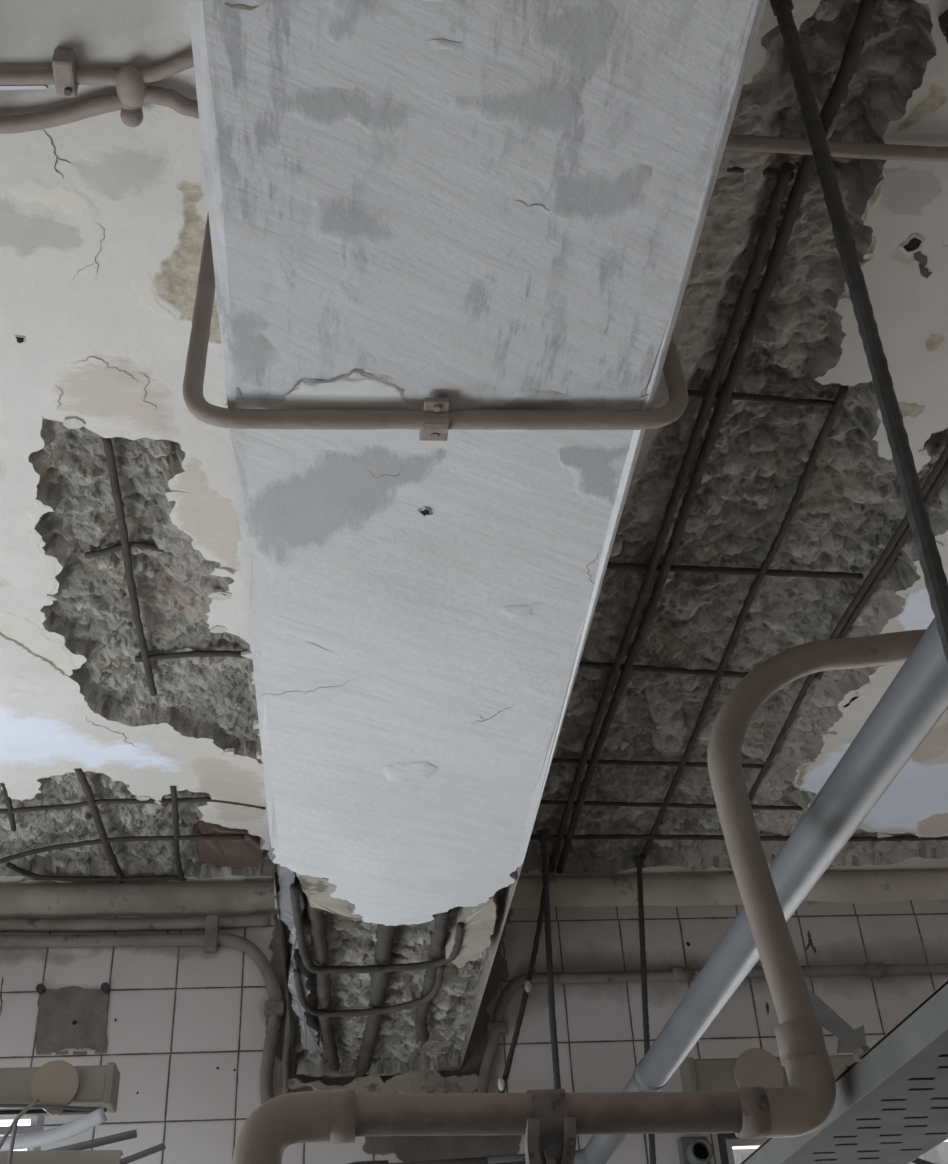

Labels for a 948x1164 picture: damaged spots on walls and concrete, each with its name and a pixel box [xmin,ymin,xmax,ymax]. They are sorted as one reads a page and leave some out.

flaking render [0,0,192,70]
spalling [729,25,808,139]
spalling [796,0,948,144]
crack [42,130,70,179]
spalling [831,157,943,268]
crack [71,223,105,281]
flaking render [898,401,927,419]
spalling [917,428,948,549]
spalling [0,144,921,1079]
flaking render [911,721,948,763]
spalling [828,812,948,868]